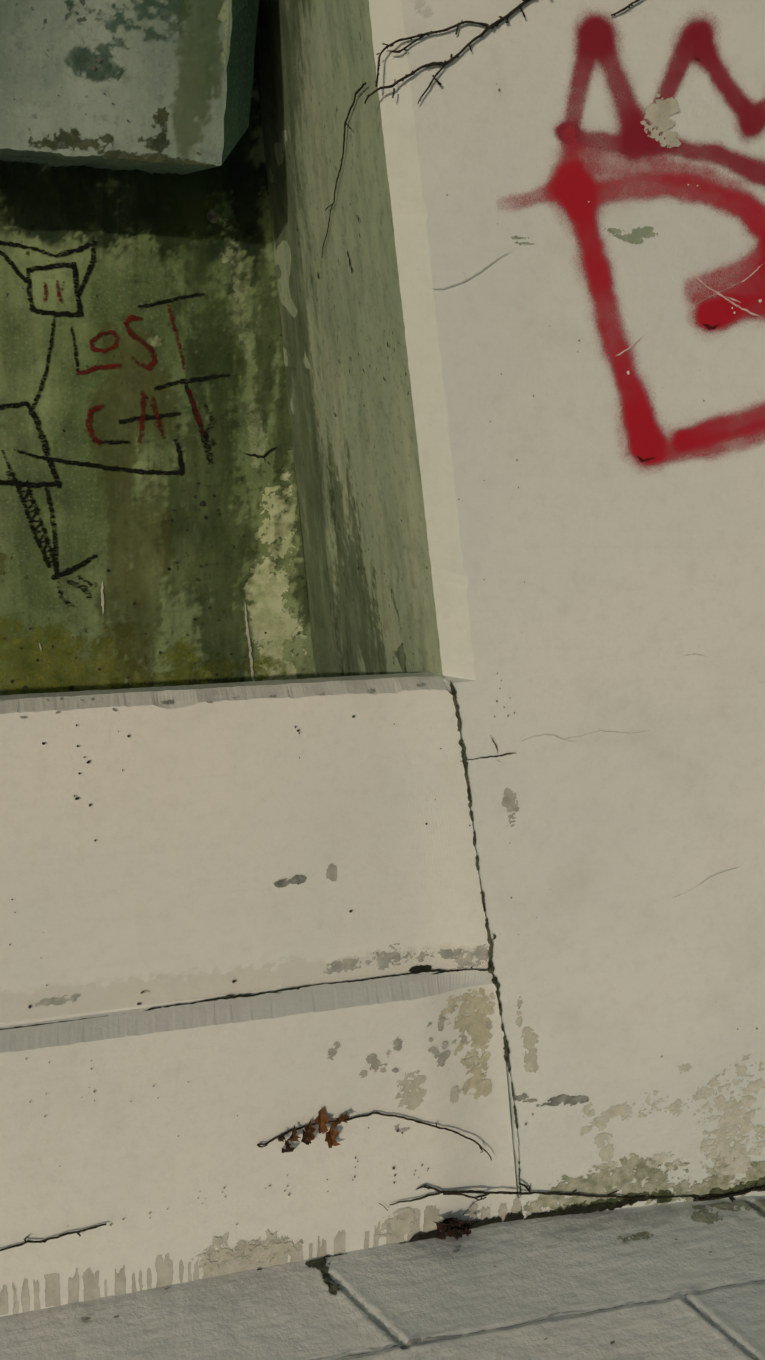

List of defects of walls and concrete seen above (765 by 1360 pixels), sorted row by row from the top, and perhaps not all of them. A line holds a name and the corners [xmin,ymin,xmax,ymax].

water stain [65,0,191,81]
peeling [641,93,681,148]
water stain [192,217,258,364]
water stain [248,388,268,468]
water stain [242,468,308,681]
peeling [327,1042,342,1060]
peeling [359,988,496,1110]
peeling [468,1054,765,1225]
peeling [0,1223,345,1321]